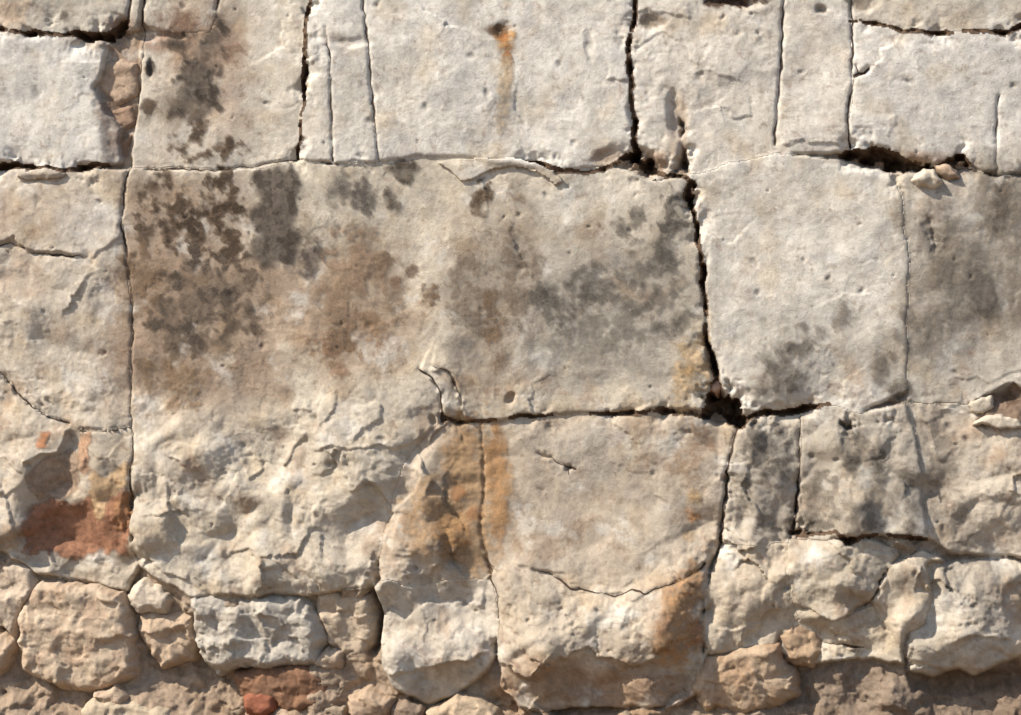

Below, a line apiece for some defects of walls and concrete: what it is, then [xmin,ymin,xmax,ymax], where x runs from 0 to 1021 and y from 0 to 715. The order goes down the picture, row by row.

damp [704,0,768,8]
crack [362,0,380,162]
corrosion [486,24,515,127]
crack [773,1,784,144]
crack [847,1,869,156]
damp [116,11,420,410]
damp [470,179,494,215]
damp [421,195,694,343]
spalling [968,383,1021,431]
spalling [21,431,132,561]
crack [718,426,741,543]
crack [535,562,706,597]